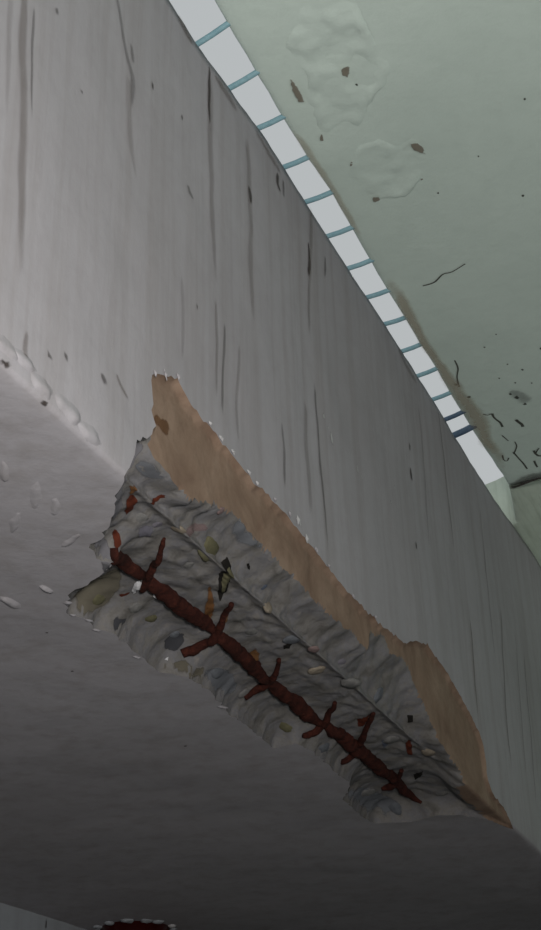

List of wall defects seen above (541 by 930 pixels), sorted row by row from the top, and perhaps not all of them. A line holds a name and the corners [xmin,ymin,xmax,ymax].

crack [423,264,465,286]
crack [483,413,541,488]
corrosion [112,530,121,548]
spalling [63,369,513,829]